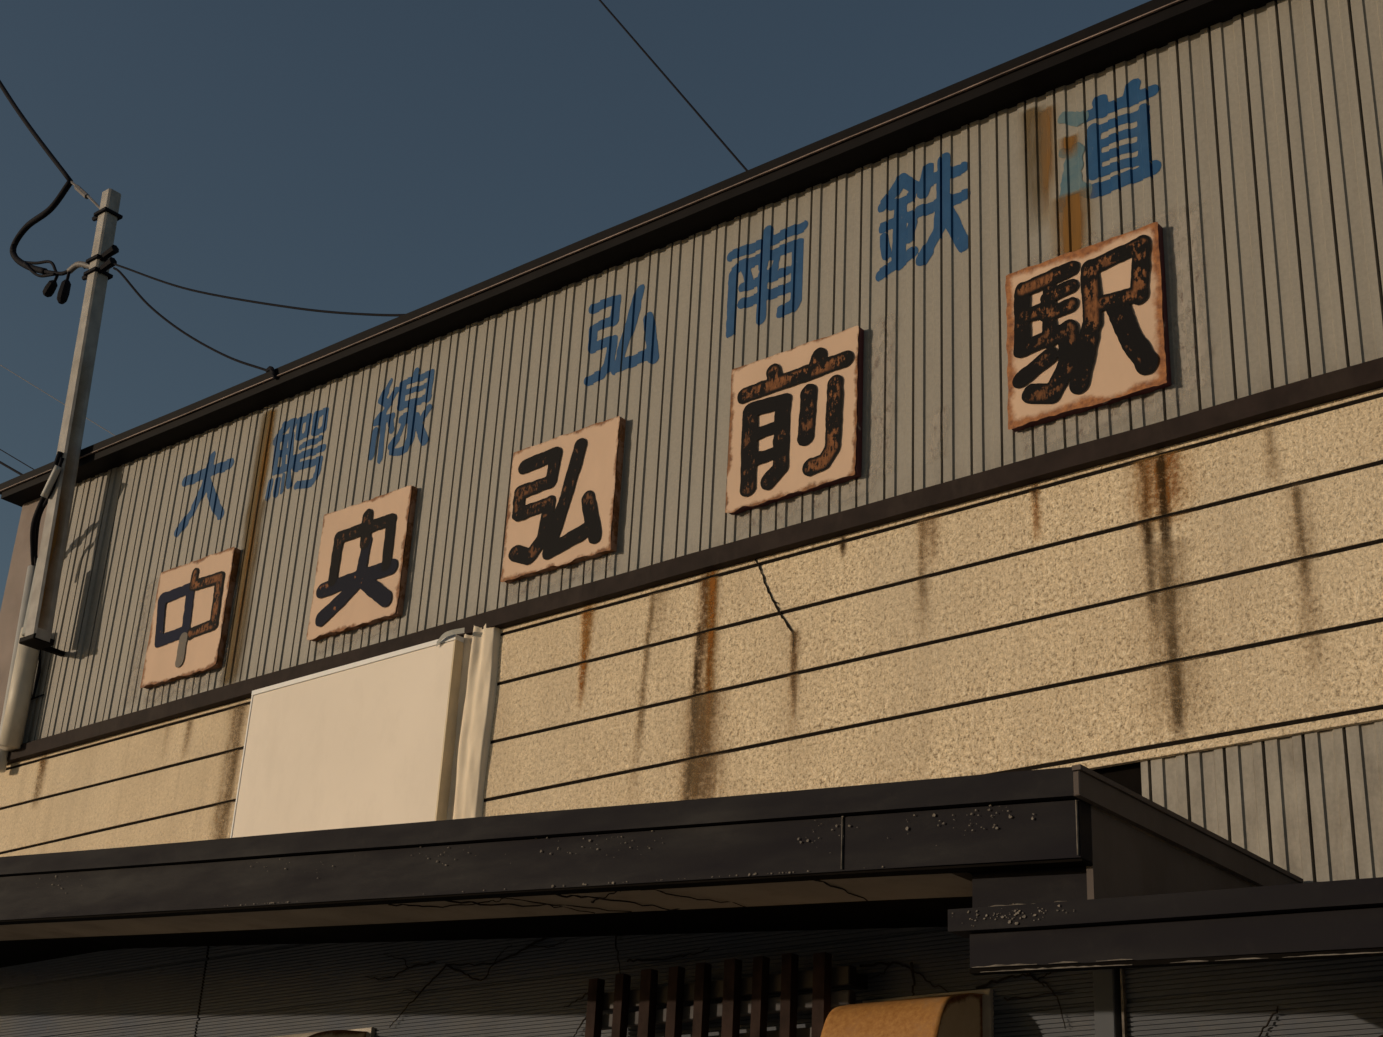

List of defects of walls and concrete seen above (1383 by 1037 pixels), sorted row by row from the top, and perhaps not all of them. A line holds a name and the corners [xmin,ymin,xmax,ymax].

rust [1023,107,1084,254]
rust [579,607,591,694]
rust [684,571,716,800]
crack [755,559,795,652]
rust [1139,448,1181,727]
water stain [1293,487,1307,582]